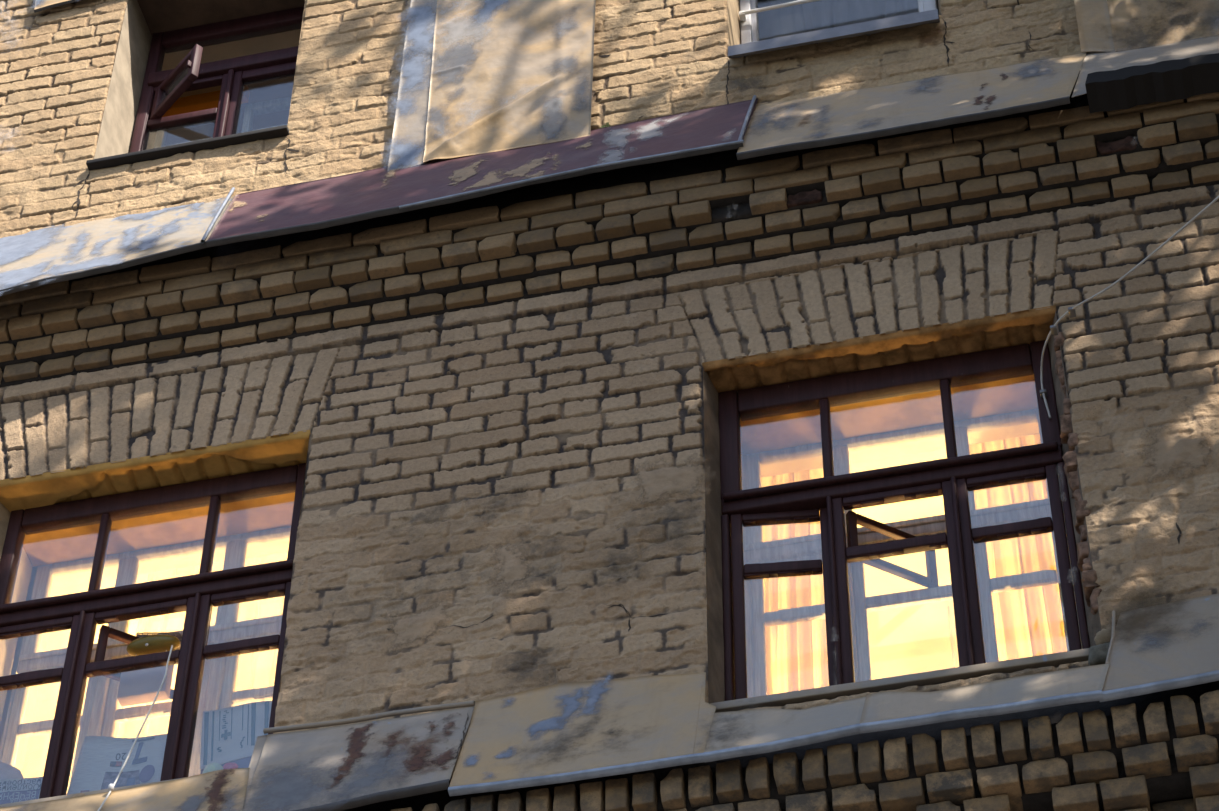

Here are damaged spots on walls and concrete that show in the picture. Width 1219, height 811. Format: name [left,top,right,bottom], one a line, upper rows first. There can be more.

peeling [393,0,508,114]
peeling [448,57,589,191]
crack [71,171,90,217]
peeling [383,141,423,183]
peeling [0,197,246,293]
peeling [529,675,611,738]
rust [330,714,460,787]
rust [205,769,235,811]